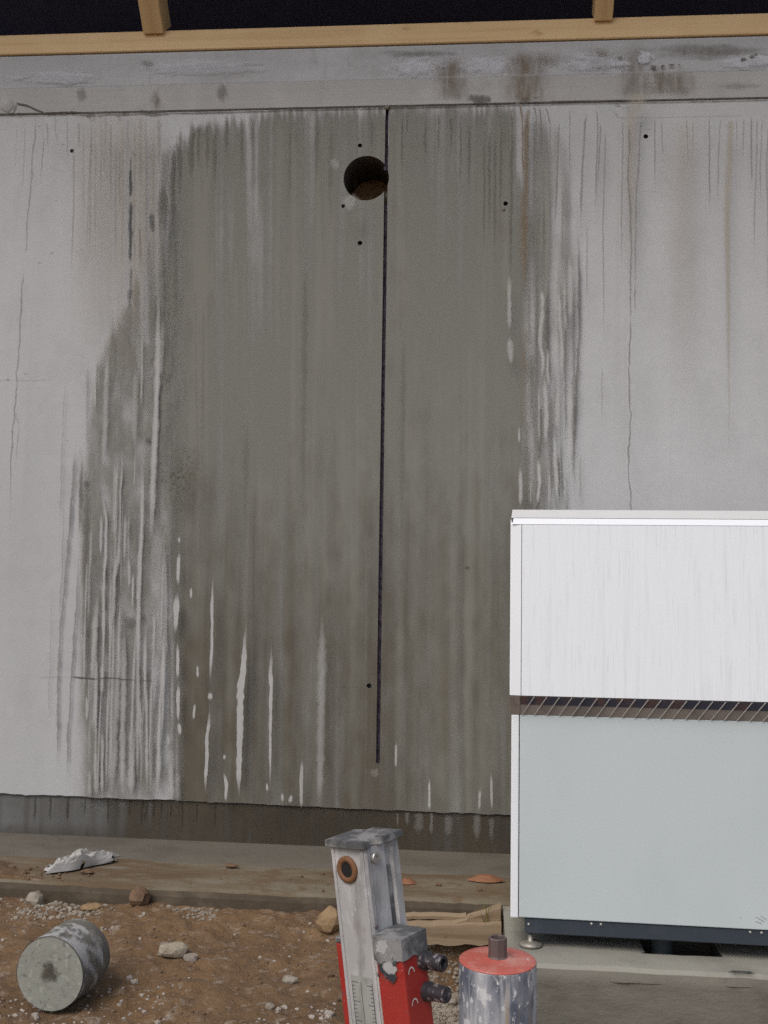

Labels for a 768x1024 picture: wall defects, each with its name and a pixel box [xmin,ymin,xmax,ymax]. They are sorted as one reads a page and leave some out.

leakage [57,95,606,854]
crack [627,132,635,507]